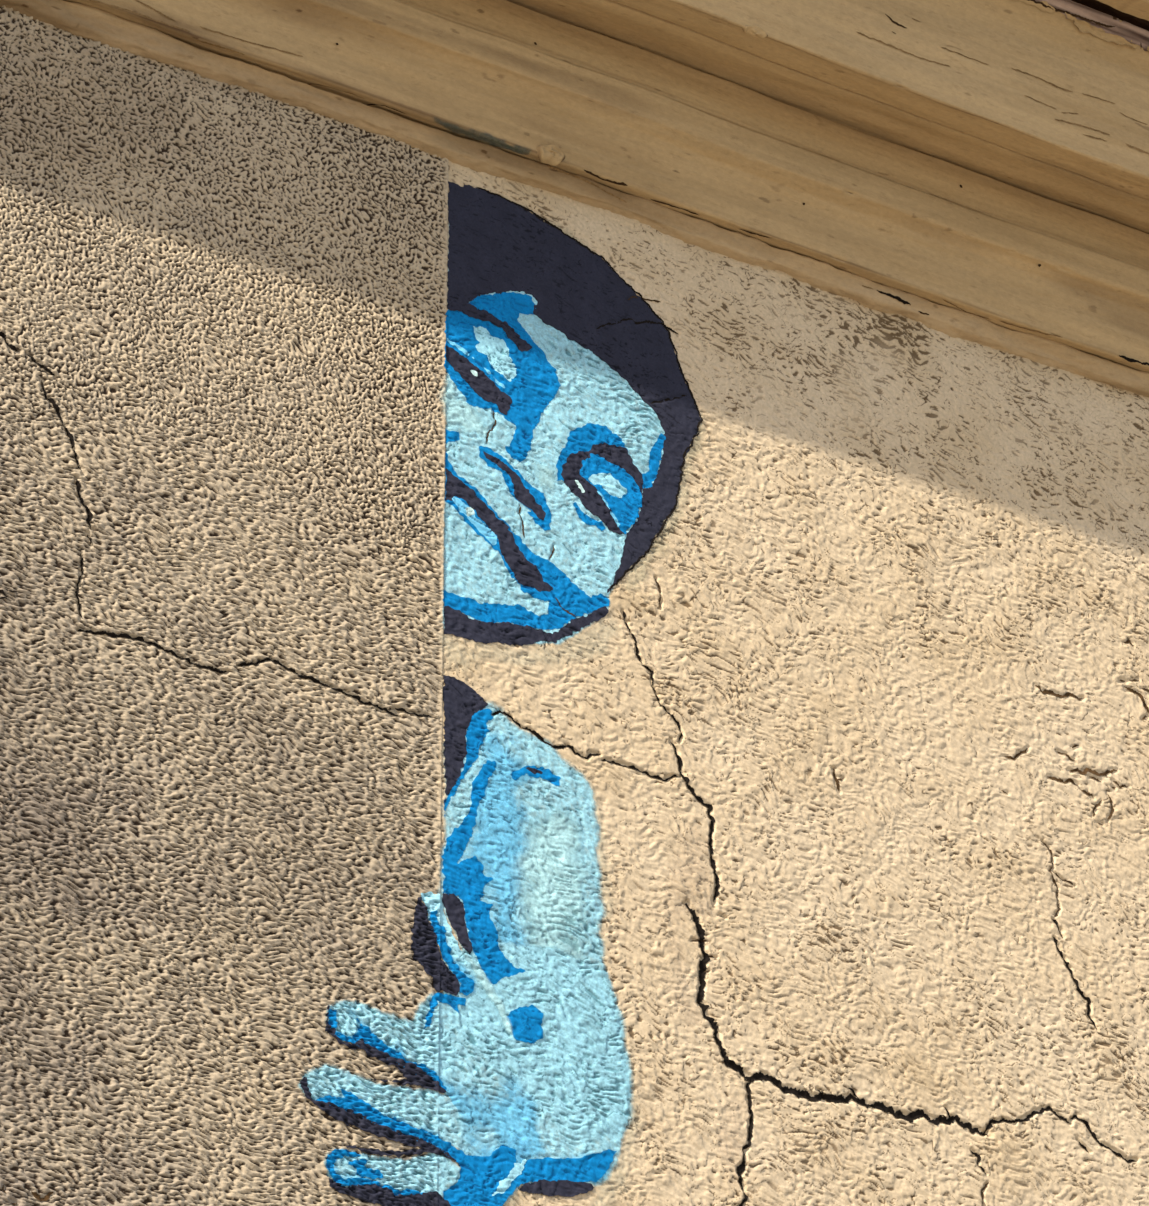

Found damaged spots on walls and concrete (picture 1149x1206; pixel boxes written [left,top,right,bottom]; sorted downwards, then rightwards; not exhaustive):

crack [0,332,431,717]
crack [492,611,1136,1206]